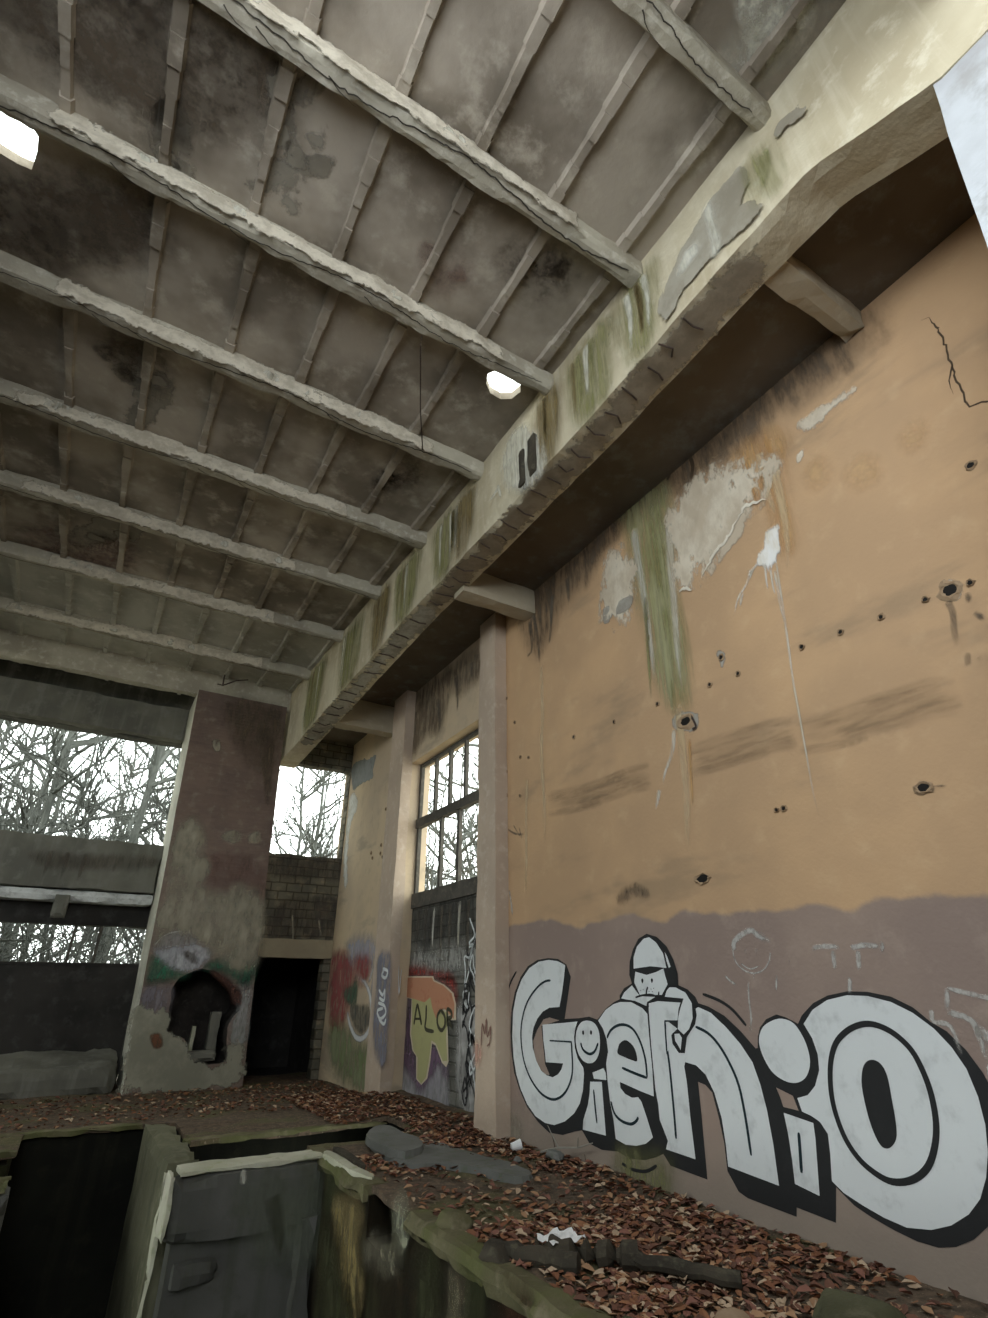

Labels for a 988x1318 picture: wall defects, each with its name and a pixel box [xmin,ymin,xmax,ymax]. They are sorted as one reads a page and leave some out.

spalling [301,166,766,745]
peeling [797,387,857,431]
crack [925,318,988,408]
water stain [371,560,412,651]
water stain [439,489,474,559]
water stain [528,339,850,801]
peeling [664,450,803,592]
water stain [412,655,480,751]
peeling [118,818,264,1094]